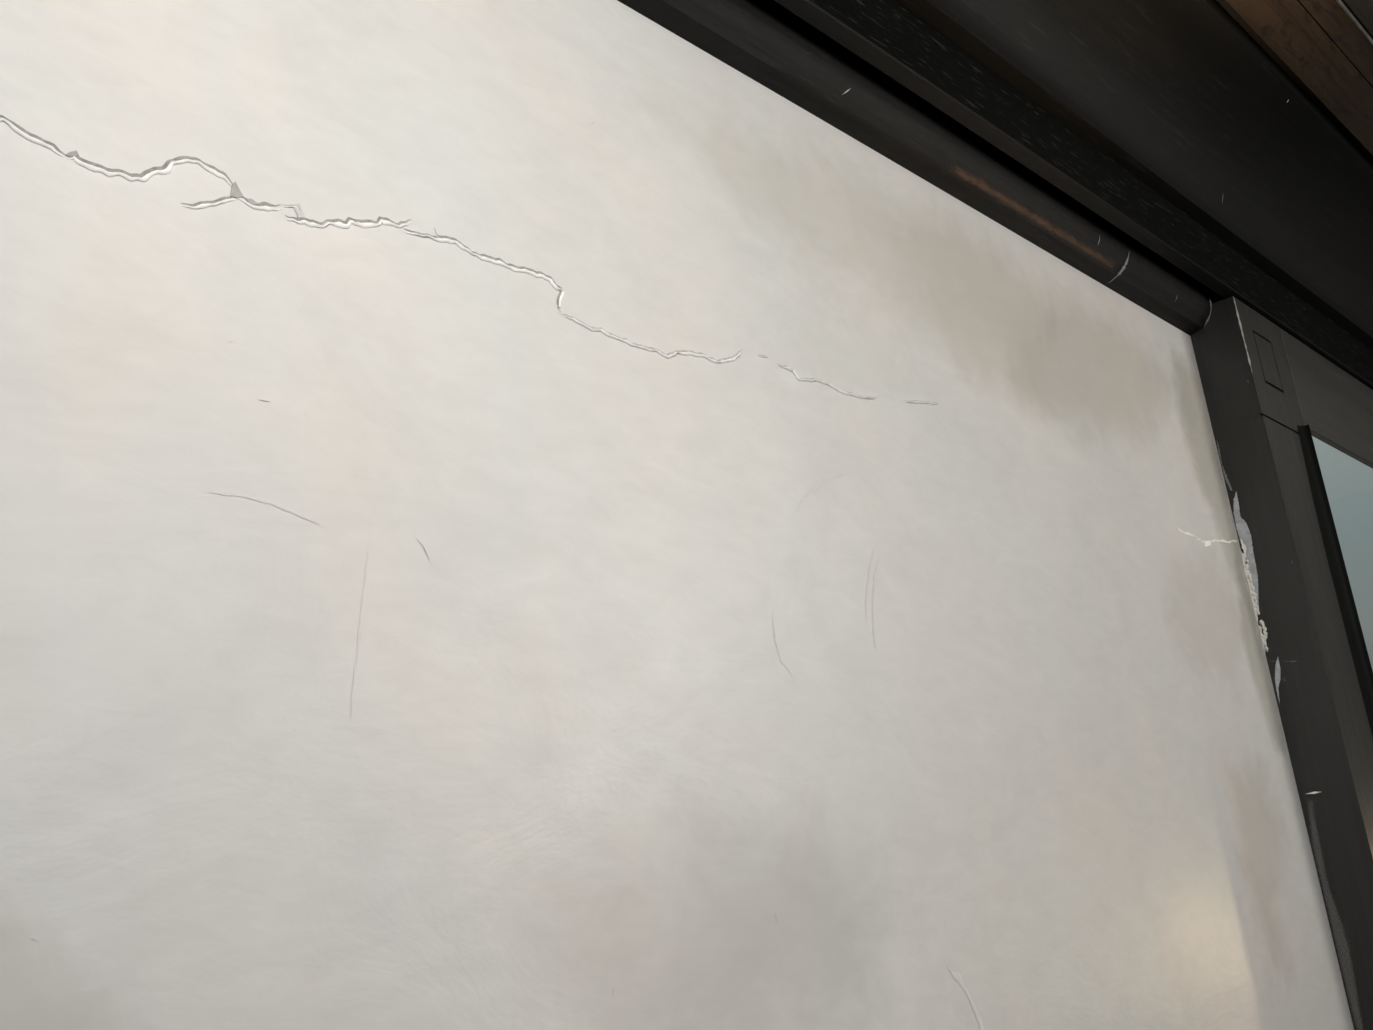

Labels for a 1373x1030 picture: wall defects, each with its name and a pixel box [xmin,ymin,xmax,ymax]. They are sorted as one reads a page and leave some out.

crack [0,115,938,405]
peeling [1233,492,1294,703]